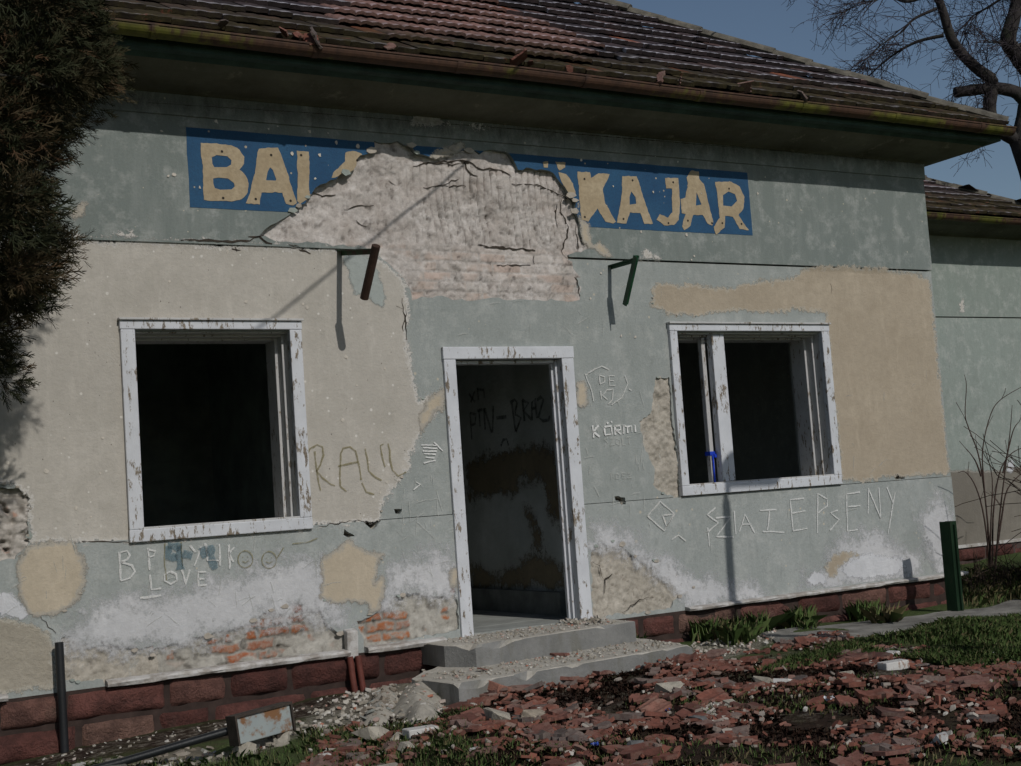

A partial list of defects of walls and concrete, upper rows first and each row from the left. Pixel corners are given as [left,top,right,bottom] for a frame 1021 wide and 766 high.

crack [312,192,374,227]
crack [413,160,579,254]
crack [478,244,535,266]
peeling [0,116,614,694]
flaking render [640,376,679,498]
peeling [649,264,1021,545]
water stain [62,550,349,662]
flaking render [590,540,682,618]
efflorescence [801,491,954,588]